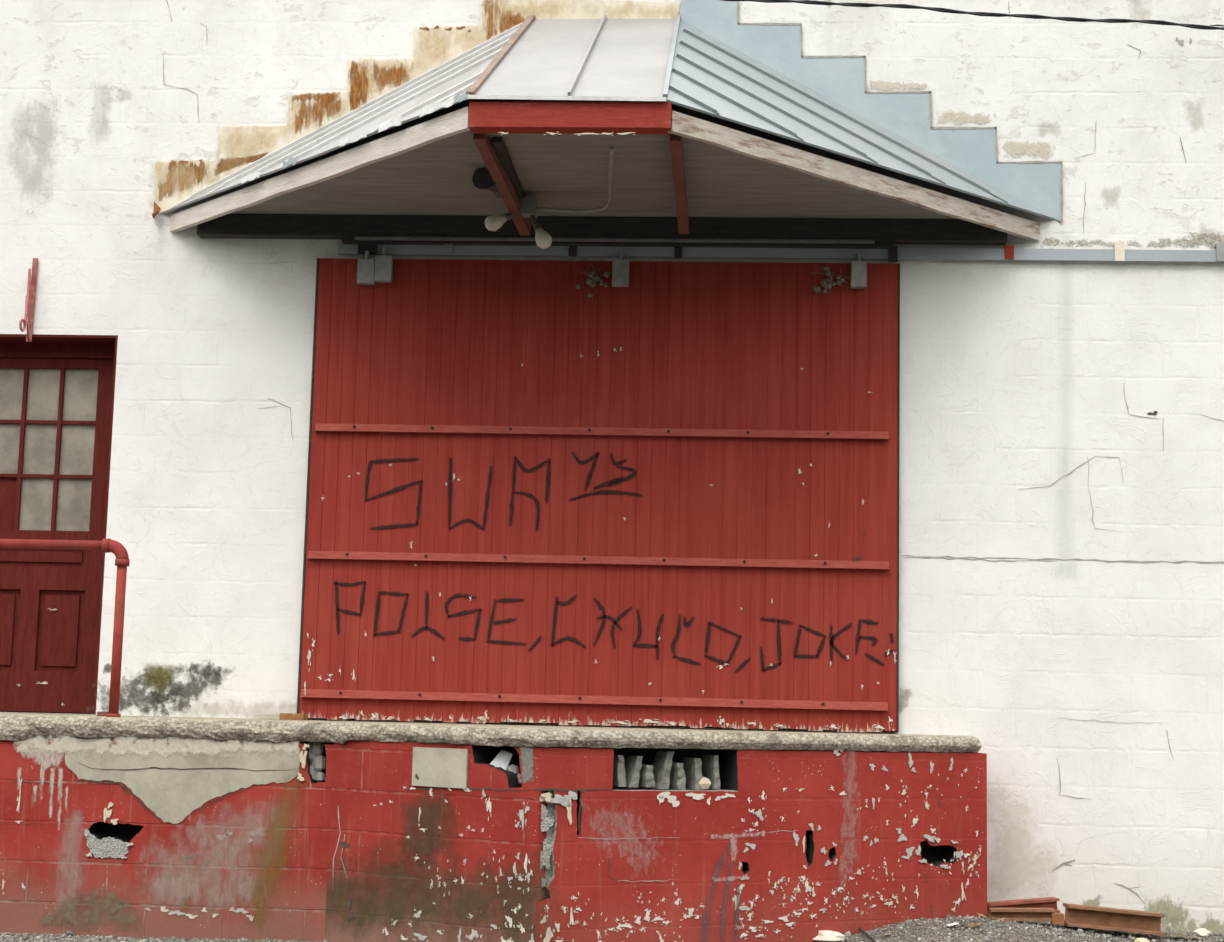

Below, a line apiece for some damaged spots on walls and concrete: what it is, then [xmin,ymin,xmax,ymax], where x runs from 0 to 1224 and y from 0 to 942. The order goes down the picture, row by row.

corrosion [293,62,409,133]
corrosion [159,153,267,201]
crack [901,456,1224,564]
water stain [88,664,228,715]
peeling [507,746,534,784]
spalling [84,802,134,859]
water stain [326,801,541,940]
spalling [383,786,704,942]
spalling [612,742,981,939]
water stain [1161,914,1224,934]